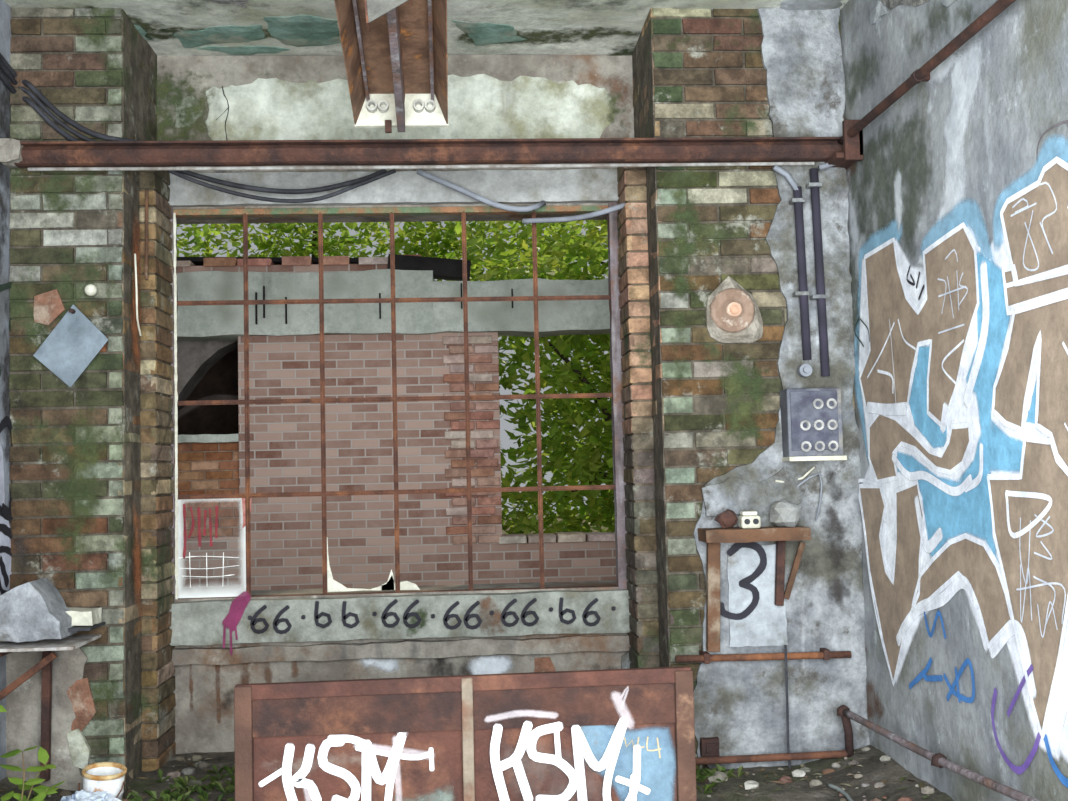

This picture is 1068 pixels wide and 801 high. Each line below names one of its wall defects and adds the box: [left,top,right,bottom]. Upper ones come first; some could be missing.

peeling [176,74,615,140]
water stain [0,162,9,257]
water stain [3,349,11,465]
peeling [701,467,809,517]